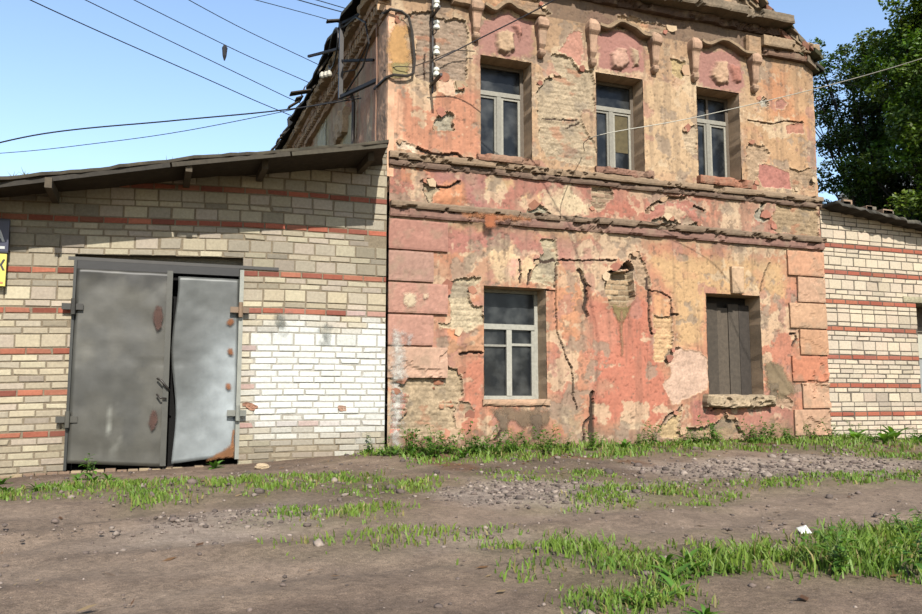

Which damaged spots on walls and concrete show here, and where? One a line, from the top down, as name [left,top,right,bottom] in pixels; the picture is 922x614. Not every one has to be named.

flaking render [394,10,469,96]
flaking render [433,107,455,131]
flaking render [536,31,597,167]
flaking render [645,195,701,226]
flaking render [745,140,820,237]
rust [153,306,163,330]
flaking render [438,276,484,336]
flaking render [530,238,560,288]
flaking render [602,251,651,306]
flaking render [389,331,475,445]
peeling [651,315,744,441]
rust [208,430,235,460]